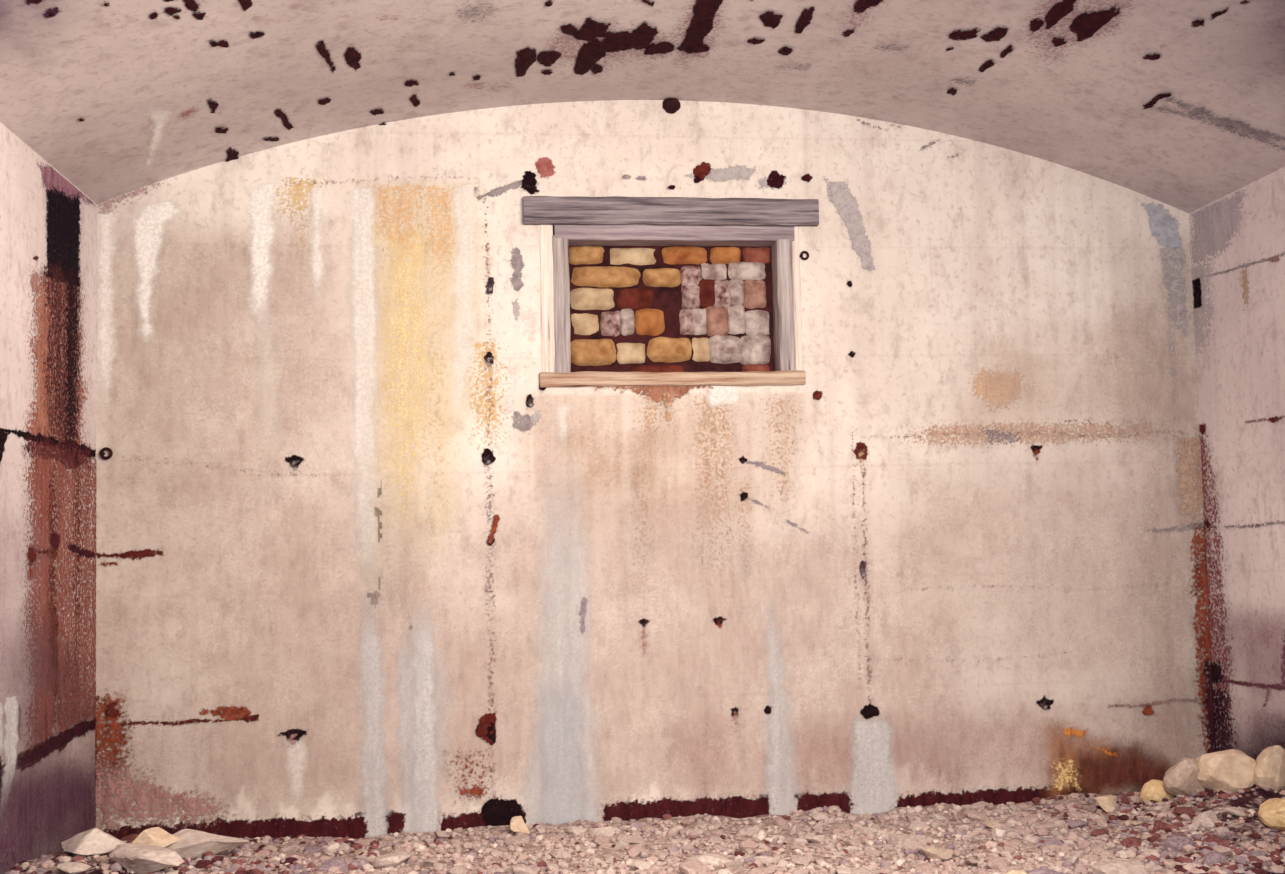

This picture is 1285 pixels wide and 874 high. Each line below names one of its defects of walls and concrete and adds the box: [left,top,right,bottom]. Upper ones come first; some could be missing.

spalling [26,0,59,19]
spalling [149,0,206,20]
spalling [209,39,230,48]
spalling [515,0,726,77]
spalling [946,0,1136,73]
crack [1,428,209,472]
rust [17,263,239,833]
damp [0,177,1099,874]
rust [1173,423,1239,754]